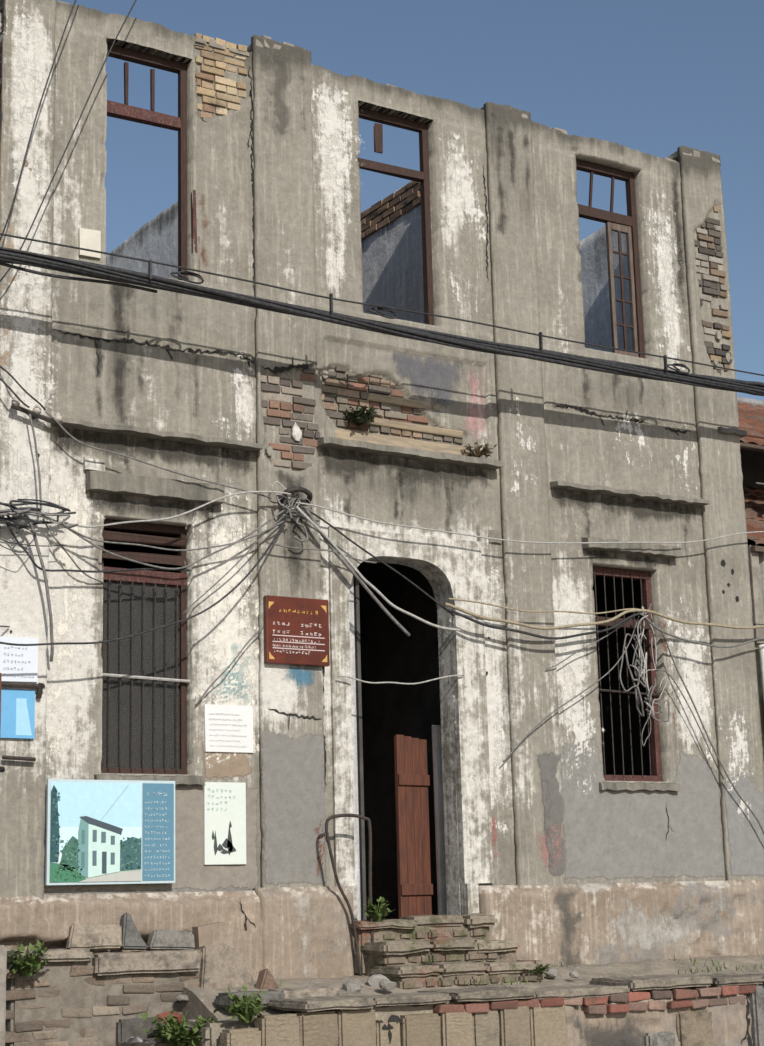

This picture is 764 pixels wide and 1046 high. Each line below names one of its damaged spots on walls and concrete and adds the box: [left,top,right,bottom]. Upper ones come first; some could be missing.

flaking render [193,33,248,122]
damp [261,56,288,135]
peeling [312,86,421,279]
damp [498,127,528,230]
flaking render [694,206,733,375]
crack [53,329,318,377]
flaking render [212,352,463,469]
crack [555,404,691,436]
damp [279,473,309,575]
peeling [664,597,754,791]
damp [556,892,580,965]
damp [612,900,690,954]